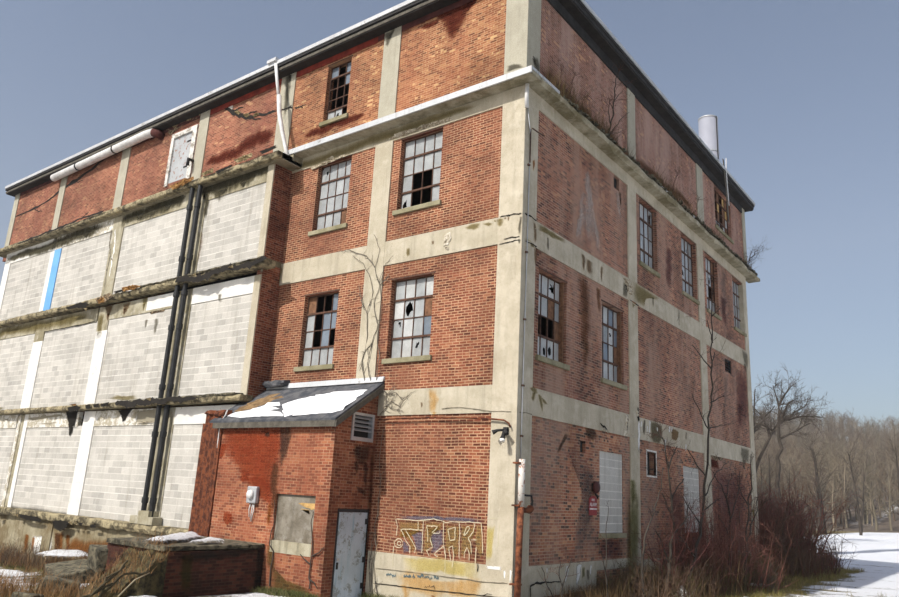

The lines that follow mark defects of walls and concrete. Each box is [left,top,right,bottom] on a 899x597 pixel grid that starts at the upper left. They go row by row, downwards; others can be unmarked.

damp [423,0,476,34]
crack [225,104,306,120]
damp [209,133,271,163]
spalling [170,145,276,190]
damp [202,166,268,215]
crack [16,159,116,286]
spalling [175,256,267,283]
spalling [66,285,140,311]
spalling [30,395,196,425]